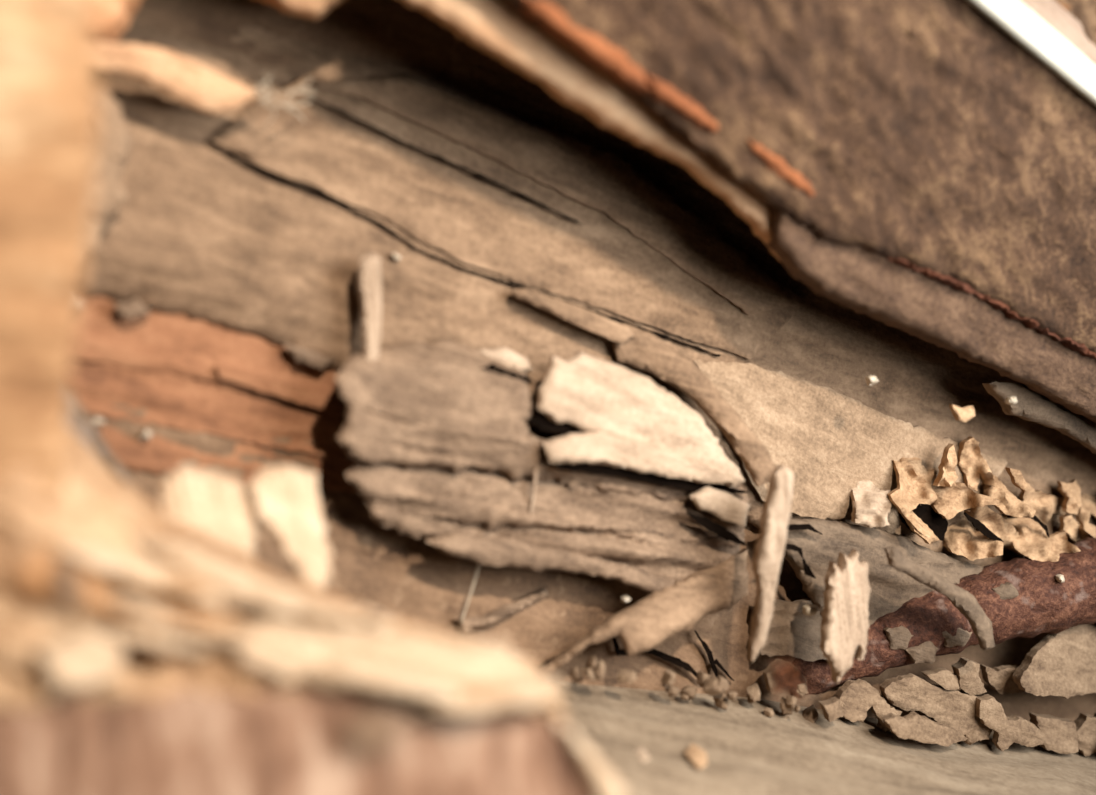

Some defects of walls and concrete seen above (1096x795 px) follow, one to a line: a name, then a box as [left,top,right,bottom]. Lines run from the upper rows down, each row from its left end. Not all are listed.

crack [210,144,721,357]
crack [477,363,537,383]
peeling [69,19,1096,669]
corrosion [776,590,979,696]
corrosion [955,538,1096,645]